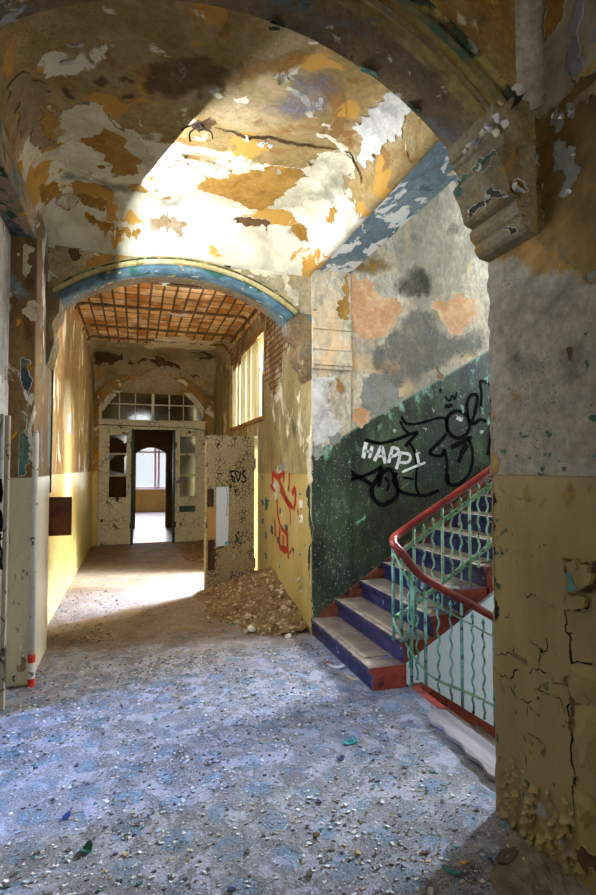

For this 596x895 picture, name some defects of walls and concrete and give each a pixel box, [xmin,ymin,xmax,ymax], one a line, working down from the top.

leakage [120,57,228,99]
peeling [6,71,421,231]
crack [215,127,362,181]
peeling [454,112,509,198]
flaking render [468,0,596,285]
peeling [0,166,35,278]
peeling [38,178,188,260]
flaking render [291,223,309,242]
flaking render [92,312,290,399]
flaking render [336,273,404,341]
flaking render [431,292,478,338]
crack [496,593,593,833]